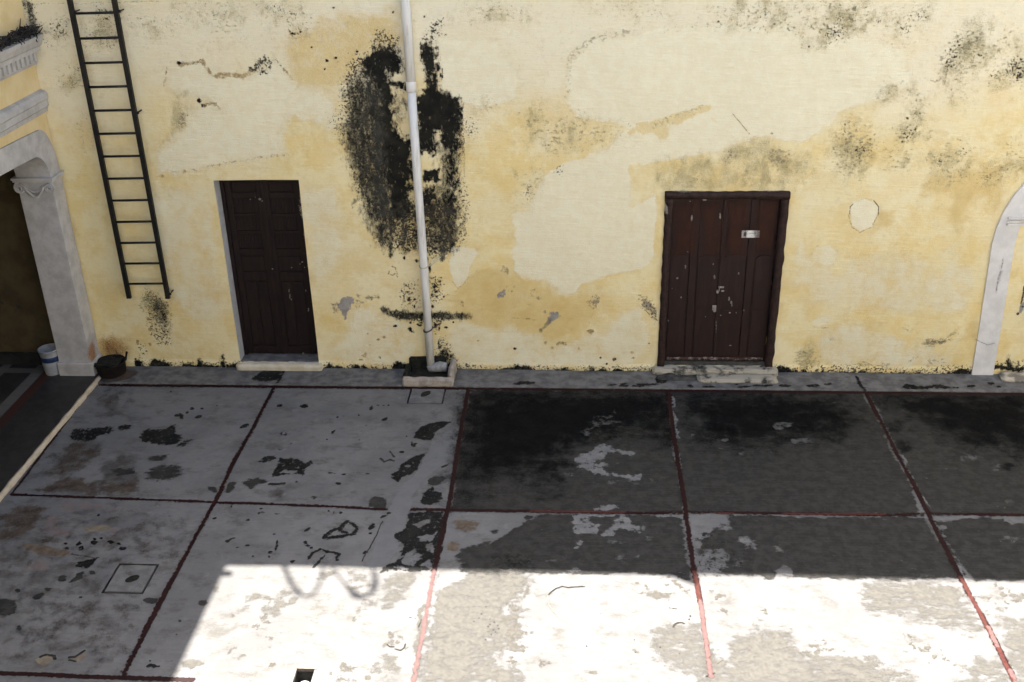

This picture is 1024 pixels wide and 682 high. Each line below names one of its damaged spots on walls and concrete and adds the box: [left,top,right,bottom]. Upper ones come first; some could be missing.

flaking render [848,198,879,233]
leakage [145,291,174,327]
leakage [134,354,243,367]
flaking render [324,294,420,368]
flaking render [445,305,650,368]
leakage [267,5,1024,583]
leakage [70,405,218,486]